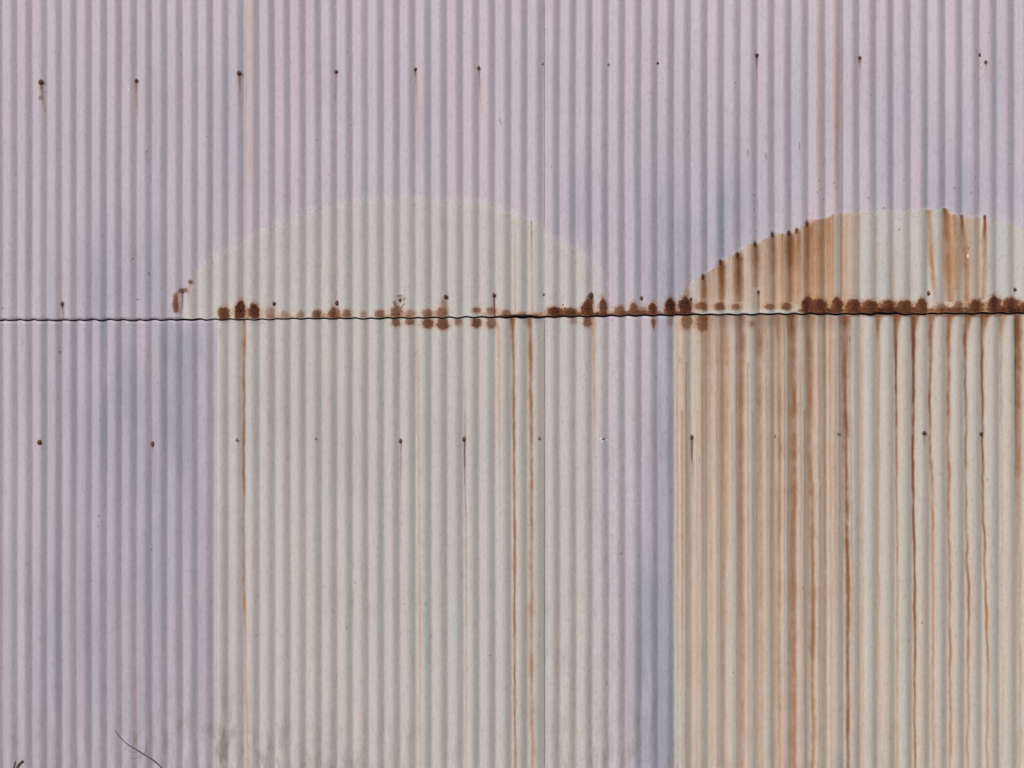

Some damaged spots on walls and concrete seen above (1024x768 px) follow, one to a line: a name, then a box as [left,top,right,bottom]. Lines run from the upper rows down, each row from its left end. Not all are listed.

rust [172,280,192,313]
rust [312,307,351,318]
rust [375,242,762,733]
rust [758,208,1024,768]